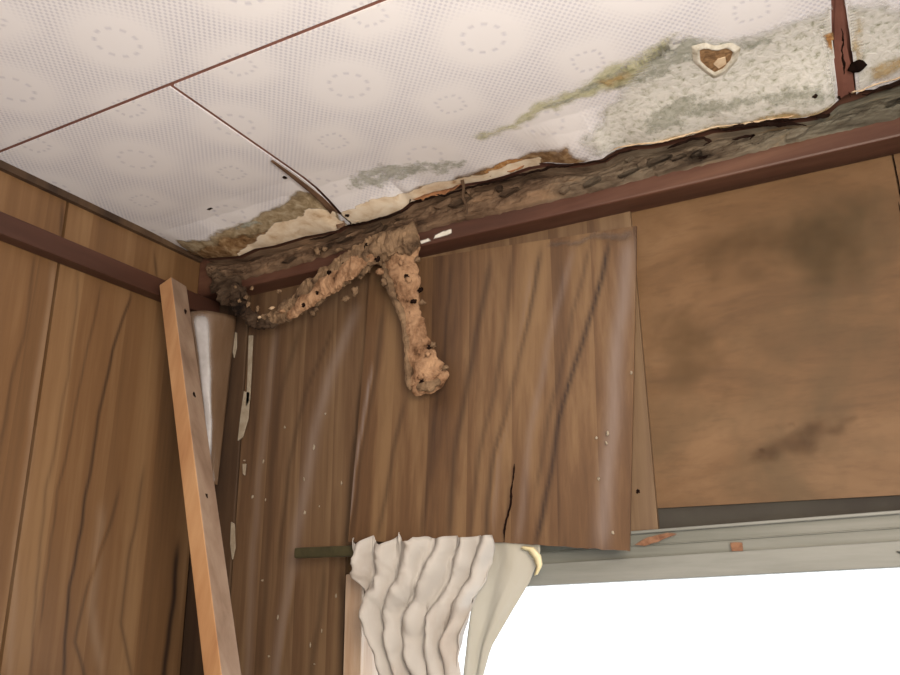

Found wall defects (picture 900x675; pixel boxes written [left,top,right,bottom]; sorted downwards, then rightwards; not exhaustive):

leakage [478,11,837,155]
spalling [692,43,741,78]
leakage [848,7,900,90]
peeling [271,160,408,256]
leakage [351,148,586,187]
peeling [618,149,702,179]